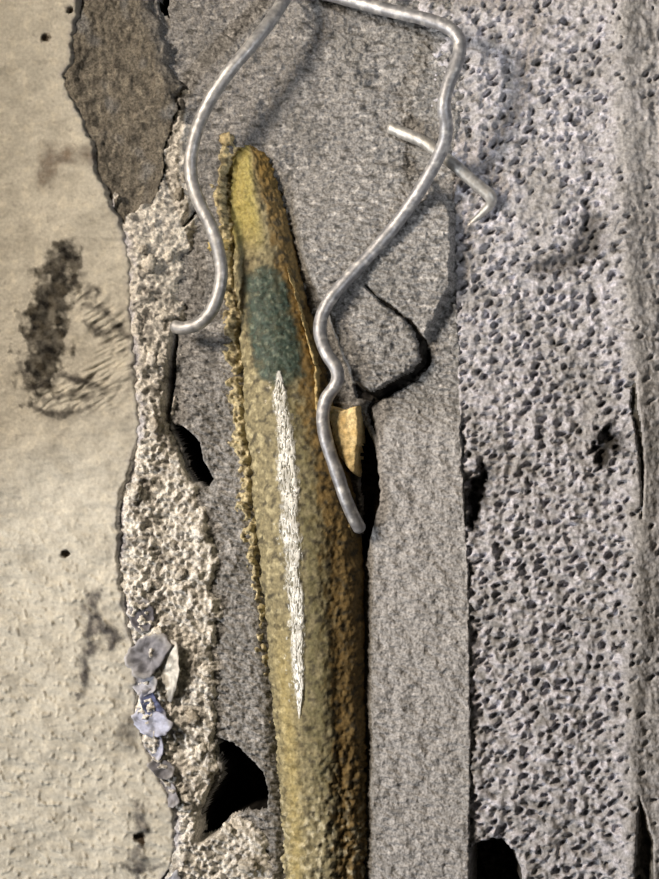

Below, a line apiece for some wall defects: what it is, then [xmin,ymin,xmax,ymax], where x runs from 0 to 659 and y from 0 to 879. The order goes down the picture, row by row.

damp [20,240,99,417]
crack [356,285,430,431]
spalling [63,0,277,879]
peeling [330,406,366,477]
crack [635,801,653,879]